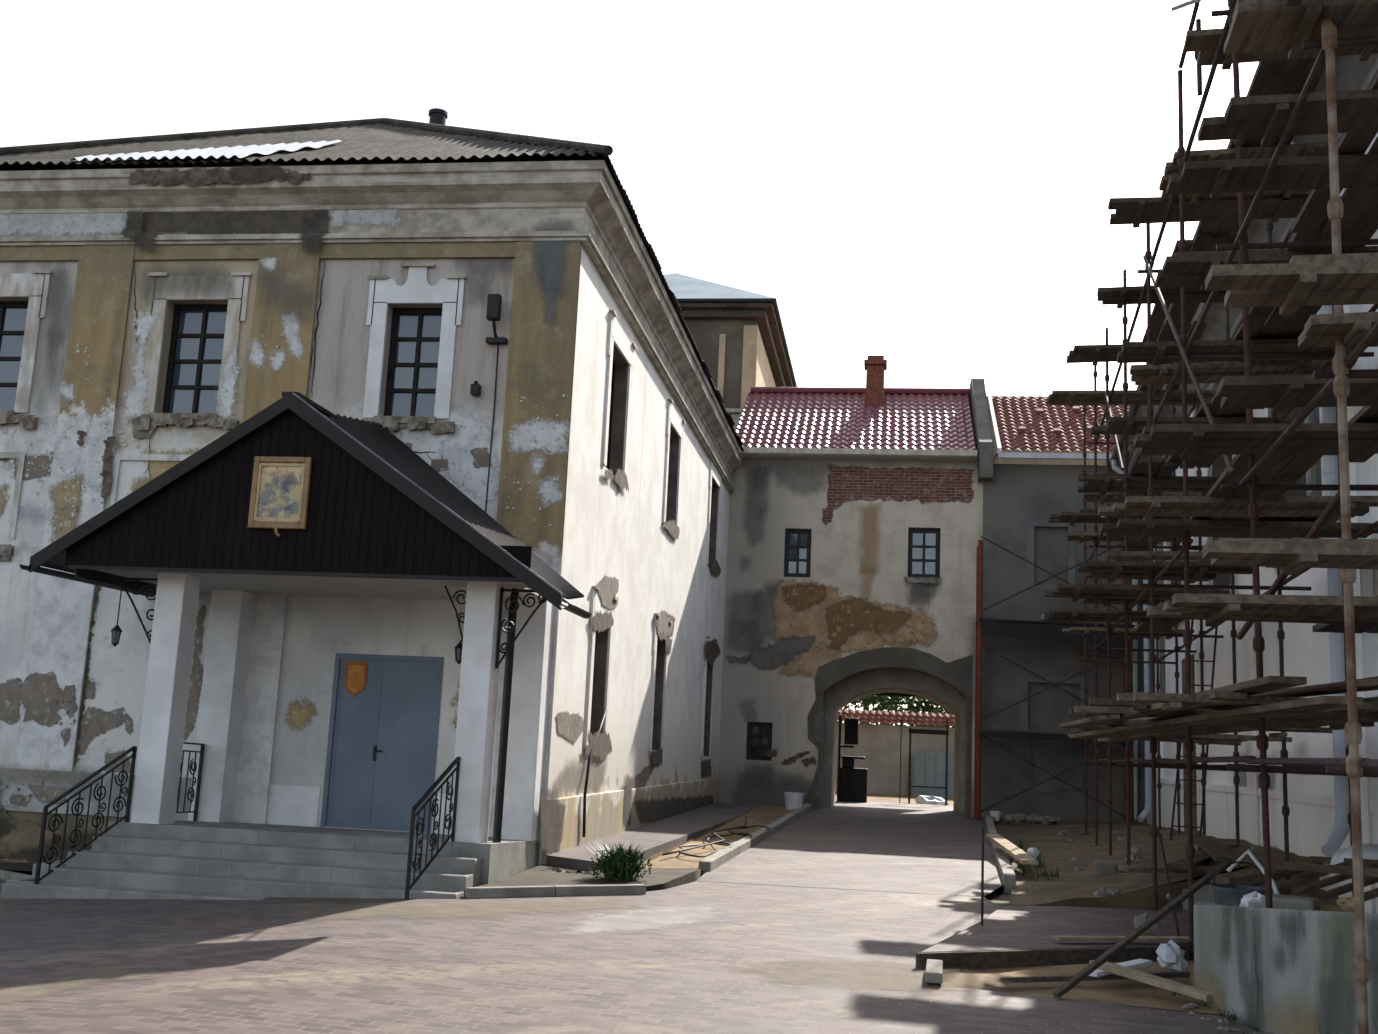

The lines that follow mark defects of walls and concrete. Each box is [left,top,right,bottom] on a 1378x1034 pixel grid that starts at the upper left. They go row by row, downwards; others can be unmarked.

peeling [0,312,199,542]
peeling [431,394,569,527]
flaking render [822,465,974,525]
spalling [591,575,619,633]
spalling [655,610,676,654]
spalling [705,638,751,666]
spalling [771,580,937,678]
spalling [0,672,133,874]
peeling [286,700,316,730]
spalling [556,711,613,761]
spalling [624,748,663,825]
damp [1222,907,1301,1030]